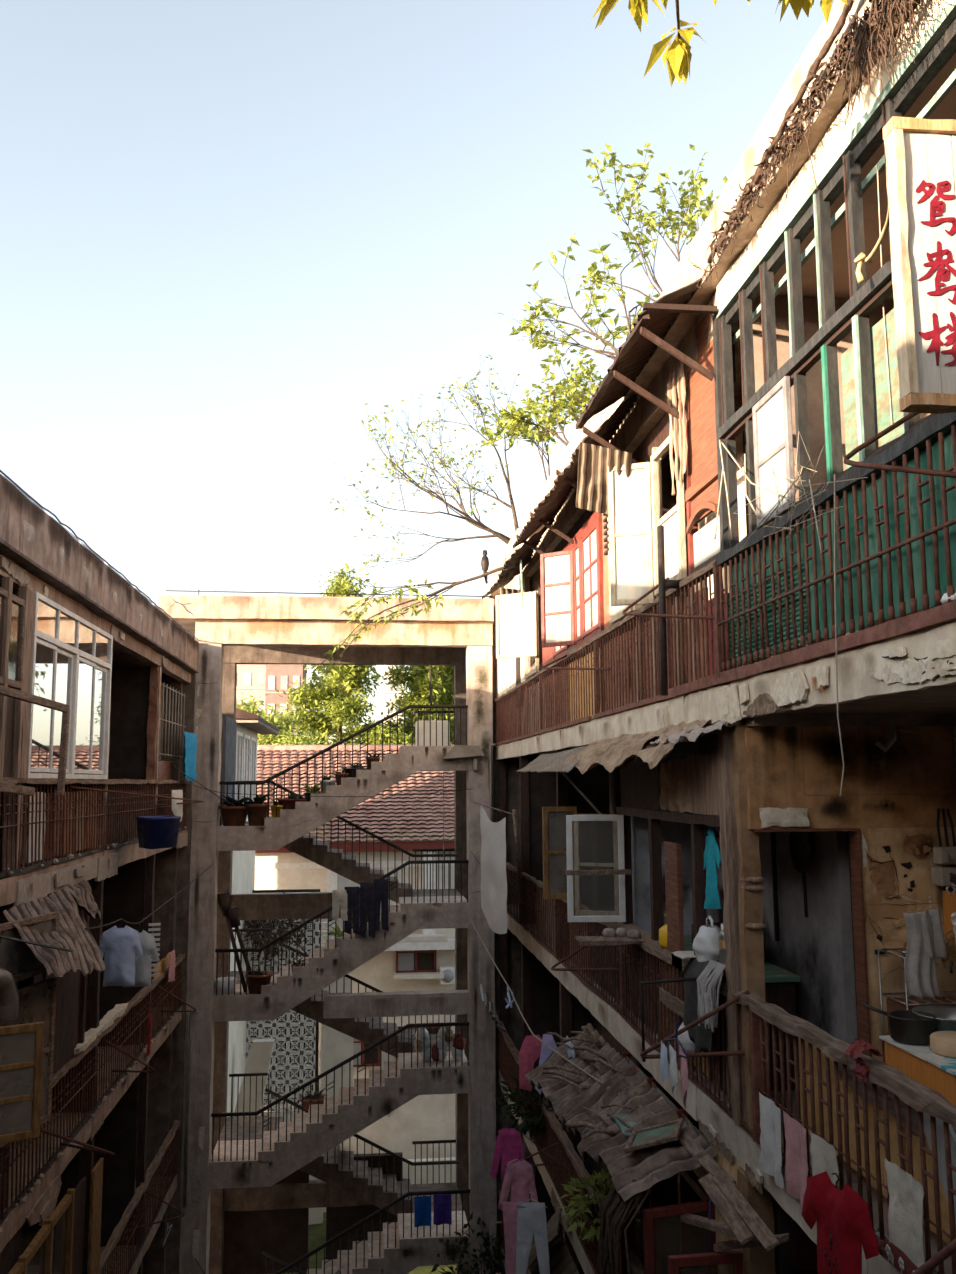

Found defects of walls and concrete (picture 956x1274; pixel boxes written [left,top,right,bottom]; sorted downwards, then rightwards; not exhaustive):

spalling [869,638,956,684]
water stain [824,798,846,817]
peeling [862,833,933,901]